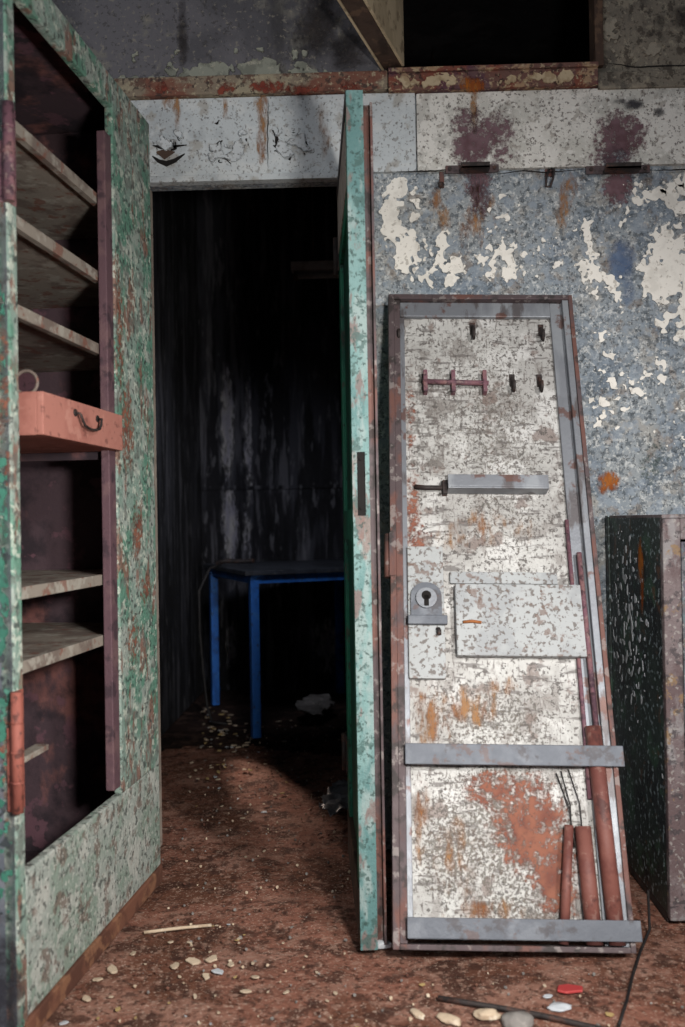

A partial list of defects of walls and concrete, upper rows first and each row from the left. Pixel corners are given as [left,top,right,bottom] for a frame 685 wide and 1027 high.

corrosion [250,81,320,159]
corrosion [450,77,518,231]
corrosion [589,109,650,207]
peeling [378,177,623,314]
peeling [613,172,685,346]
peeling [589,330,667,428]
corrosion [598,472,619,493]